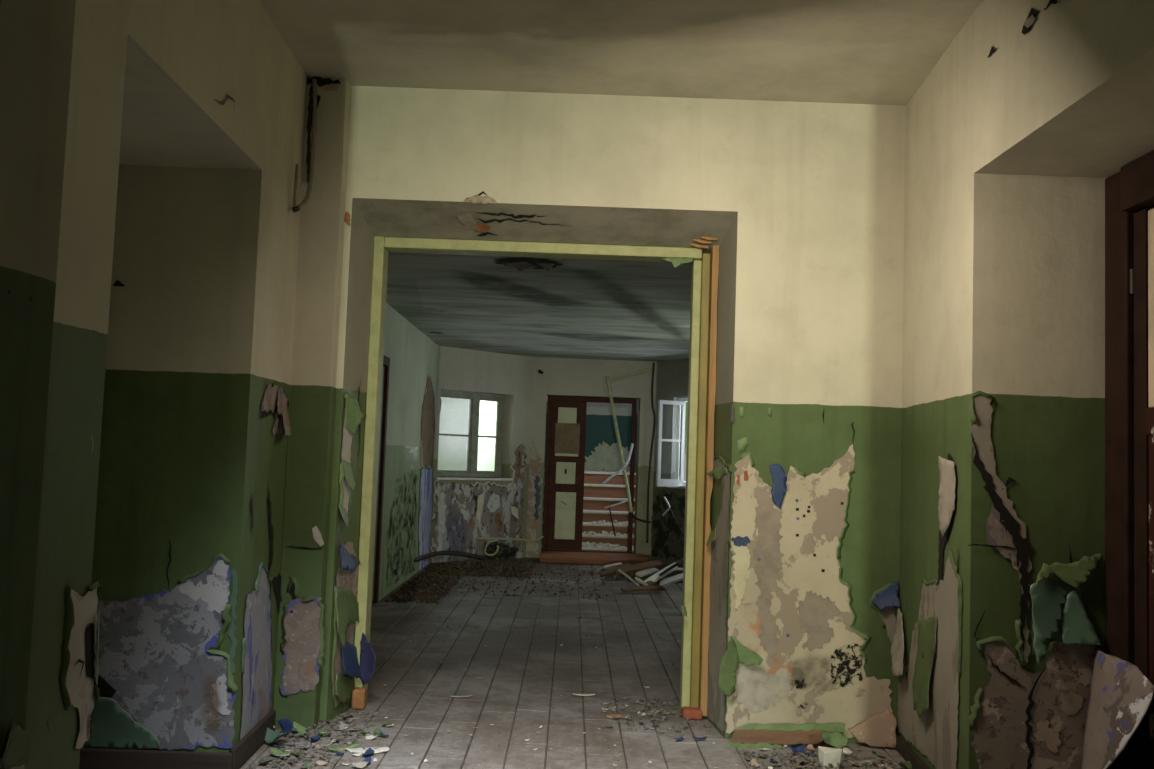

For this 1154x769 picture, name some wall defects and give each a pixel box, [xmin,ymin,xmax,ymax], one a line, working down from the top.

crack [423,212,570,236]
peeling [59,541,376,751]
peeling [260,382,292,437]
peeling [312,526,324,547]
peeling [339,378,363,527]
peeling [387,372,542,586]
peeling [705,444,1154,769]
crack [956,391,1032,667]
peeling [0,718,33,769]
peeling [258,721,394,769]